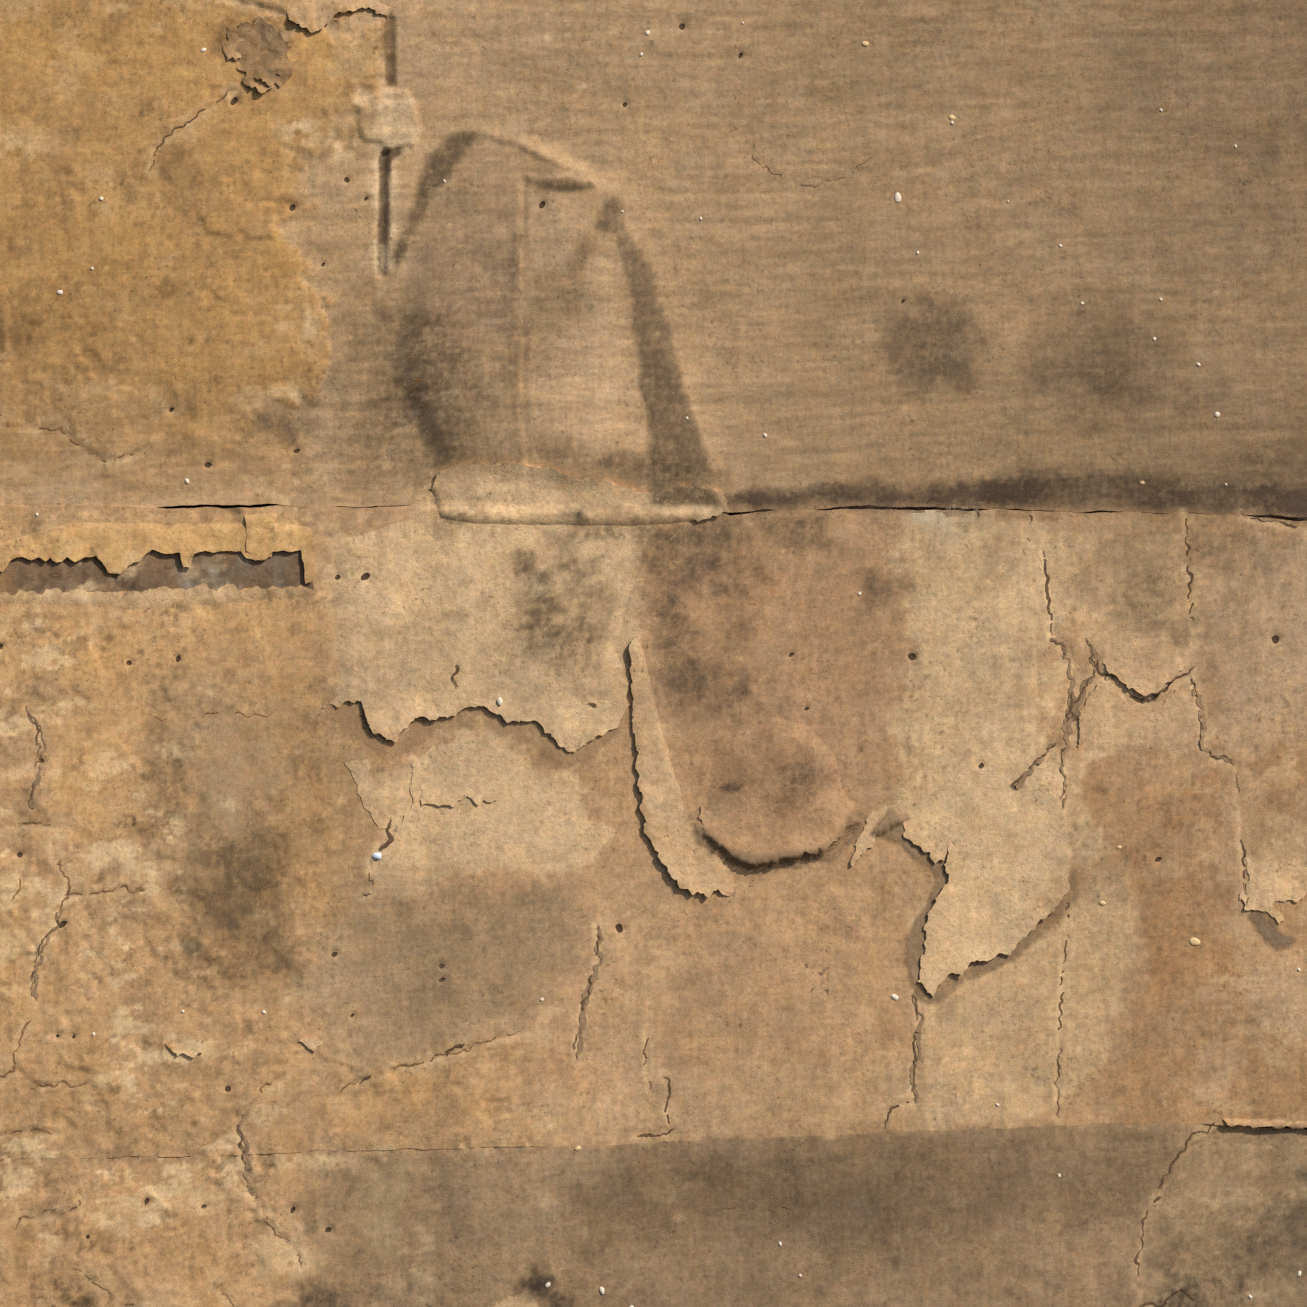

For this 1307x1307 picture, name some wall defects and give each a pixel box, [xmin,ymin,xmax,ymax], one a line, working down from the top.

damp [385,19,395,84]
crack [150,89,230,172]
damp [379,148,406,258]
damp [412,134,472,219]
damp [599,200,1085,531]
peeling [0,513,314,612]
peeling [323,462,734,898]
crack [1012,514,1240,809]
peeling [850,745,1077,1004]
peeling [1239,813,1307,950]
crack [574,924,604,1060]
crack [1135,1123,1215,1307]